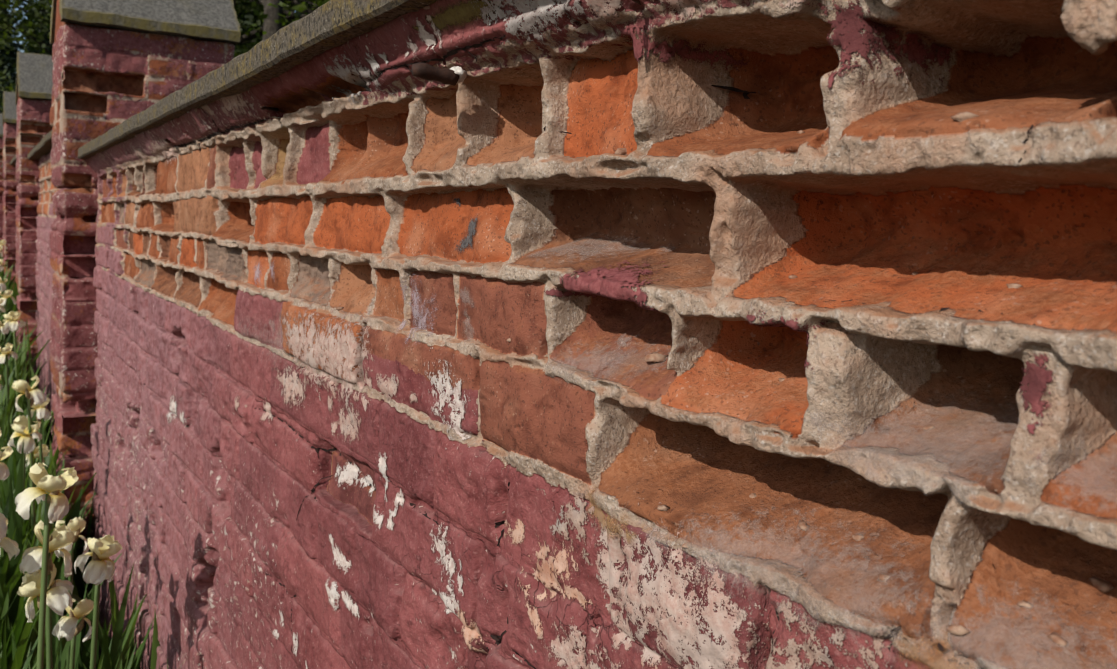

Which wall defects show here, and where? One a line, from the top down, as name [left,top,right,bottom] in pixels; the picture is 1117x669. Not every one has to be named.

peeling [403,15,442,58]
crack [370,34,505,81]
spalling [733,185,1117,332]
spalling [61,46,948,669]
spalling [844,345,1039,495]
spalling [1041,432,1117,519]
spalling [950,518,1117,669]